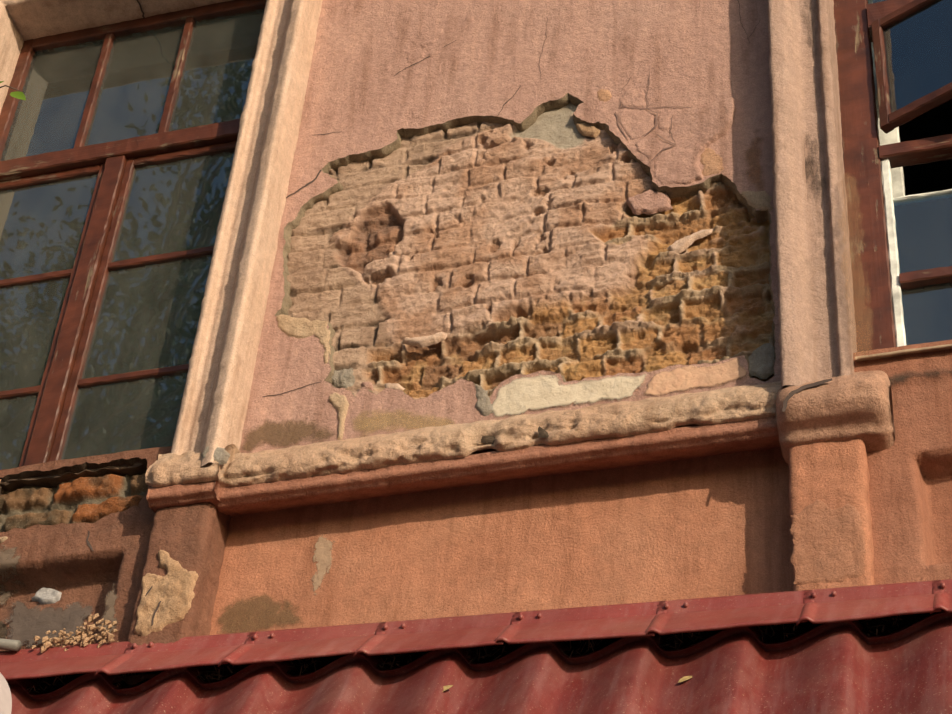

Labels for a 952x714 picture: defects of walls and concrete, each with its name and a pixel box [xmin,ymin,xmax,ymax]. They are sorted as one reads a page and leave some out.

crack [615,69,692,161]
flaking render [275,93,776,416]
flaking render [0,621,8,639]
flaking render [0,457,148,605]
flaking render [98,585,117,633]
flaking render [134,550,199,636]
peeling [311,535,335,595]